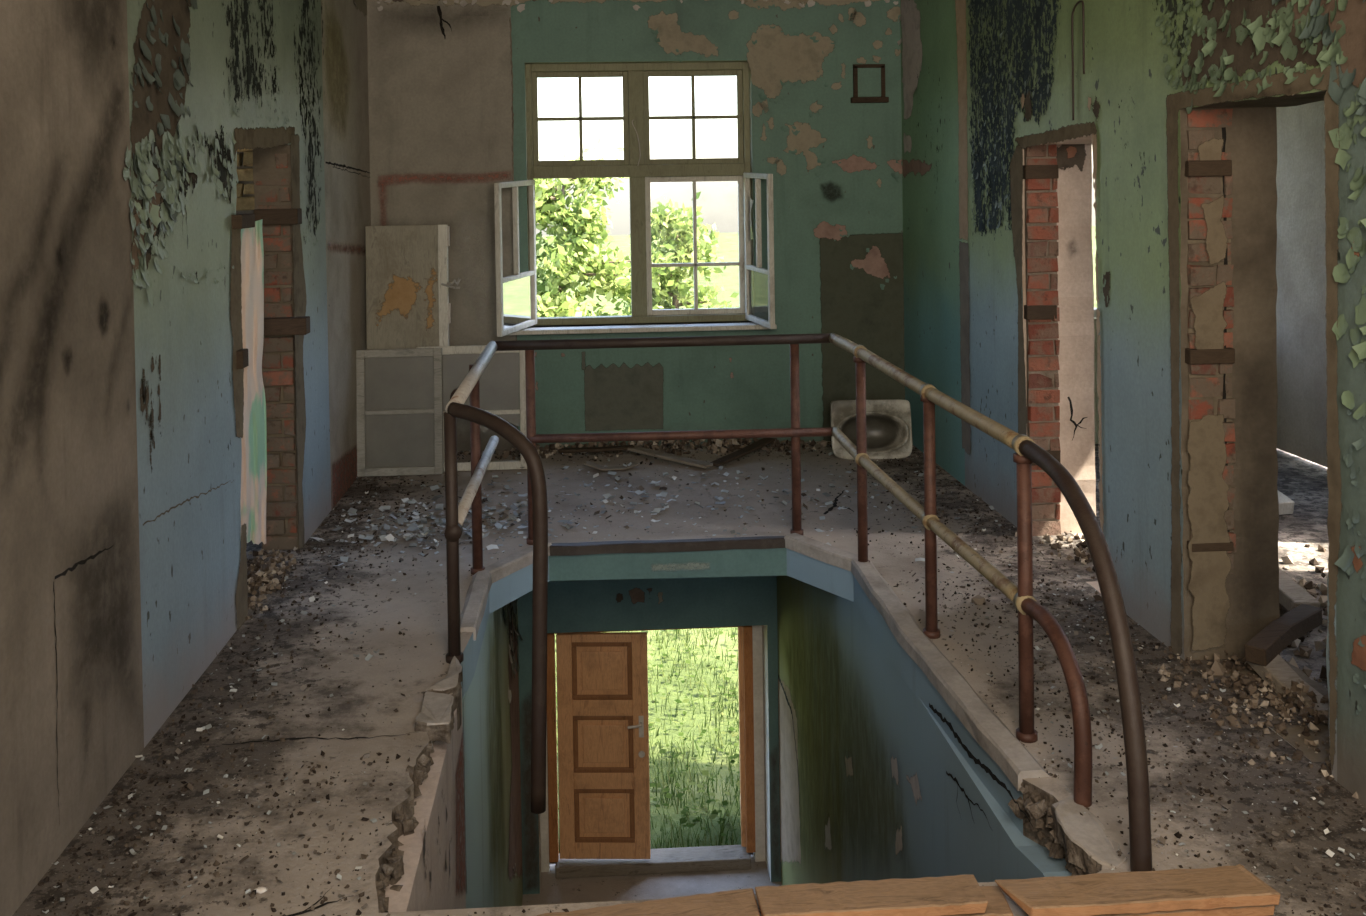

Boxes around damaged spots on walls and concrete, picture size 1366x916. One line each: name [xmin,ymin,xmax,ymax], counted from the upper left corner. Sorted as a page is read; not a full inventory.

peeling [353,0,720,62]
peeling [123,0,324,450]
peeling [140,355,161,472]
crack [143,482,232,526]
spalling [295,335,306,549]
spalling [235,524,248,630]
crack [53,546,112,824]
spalling [375,741,434,913]
crack [929,703,1033,831]